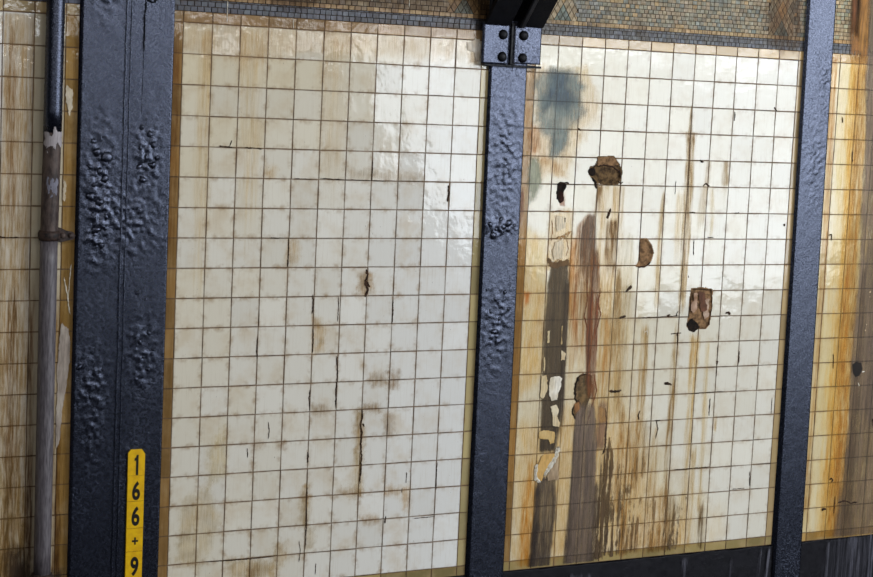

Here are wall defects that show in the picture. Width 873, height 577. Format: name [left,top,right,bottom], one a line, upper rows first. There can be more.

leakage [536,70,583,156]
corrosion [40,132,61,231]
leakage [530,159,541,199]
spalling [556,182,569,203]
spalling [588,156,623,189]
crack [363,269,371,297]
corrosion [579,215,601,405]
spalling [636,238,654,268]
spalling [686,287,713,332]
leakage [836,0,873,576]
crack [357,410,365,482]
peeling [536,357,562,481]